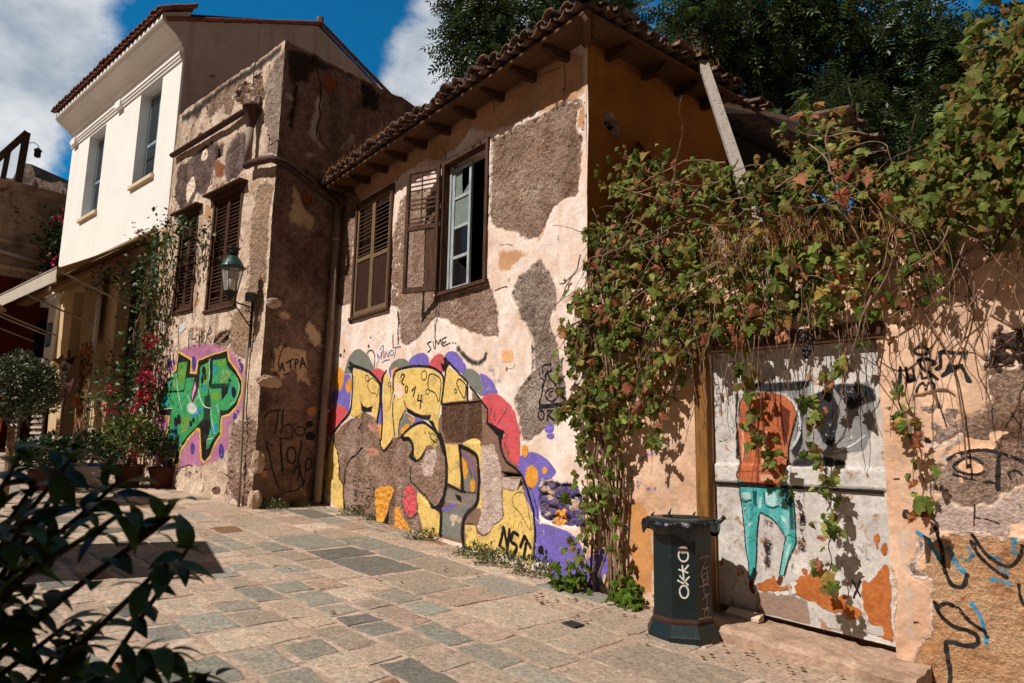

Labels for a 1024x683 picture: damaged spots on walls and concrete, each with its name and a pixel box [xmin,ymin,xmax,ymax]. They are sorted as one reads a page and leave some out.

flaking render [305,97,327,159]
crack [314,54,331,152]
flaking render [336,53,586,307]
flaking render [390,189,515,371]
flaking render [512,260,567,443]
flaking render [336,400,521,540]
flaking render [737,326,1024,683]